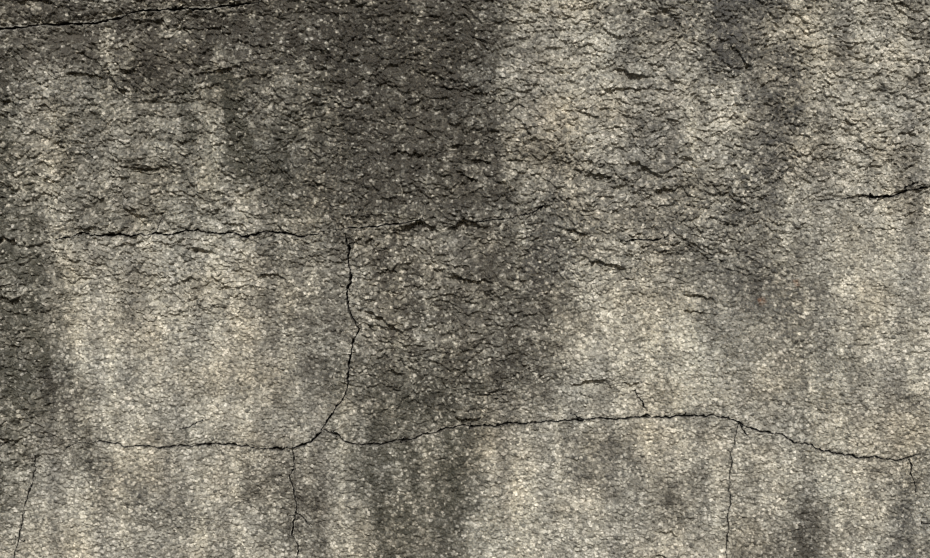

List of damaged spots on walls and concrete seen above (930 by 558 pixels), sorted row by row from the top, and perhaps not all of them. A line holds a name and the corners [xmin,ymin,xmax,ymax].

crack [0,0,265,32]
crack [477,203,546,225]
crack [56,214,930,558]
crack [11,455,39,558]